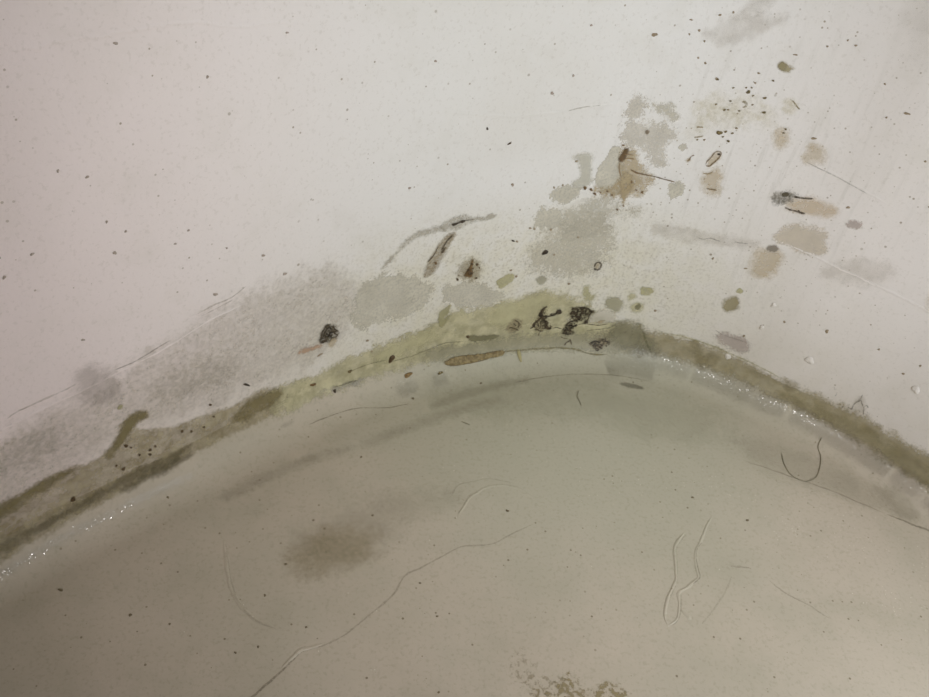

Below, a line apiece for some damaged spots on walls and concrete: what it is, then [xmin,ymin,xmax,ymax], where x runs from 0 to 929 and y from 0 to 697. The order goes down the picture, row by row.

water stain [621,97,694,167]
water stain [668,181,685,199]
water stain [529,184,618,277]
water stain [767,192,827,255]
water stain [350,214,504,331]
water stain [723,288,743,311]
water stain [303,325,338,353]
water stain [426,307,641,360]
water stain [0,474,65,517]